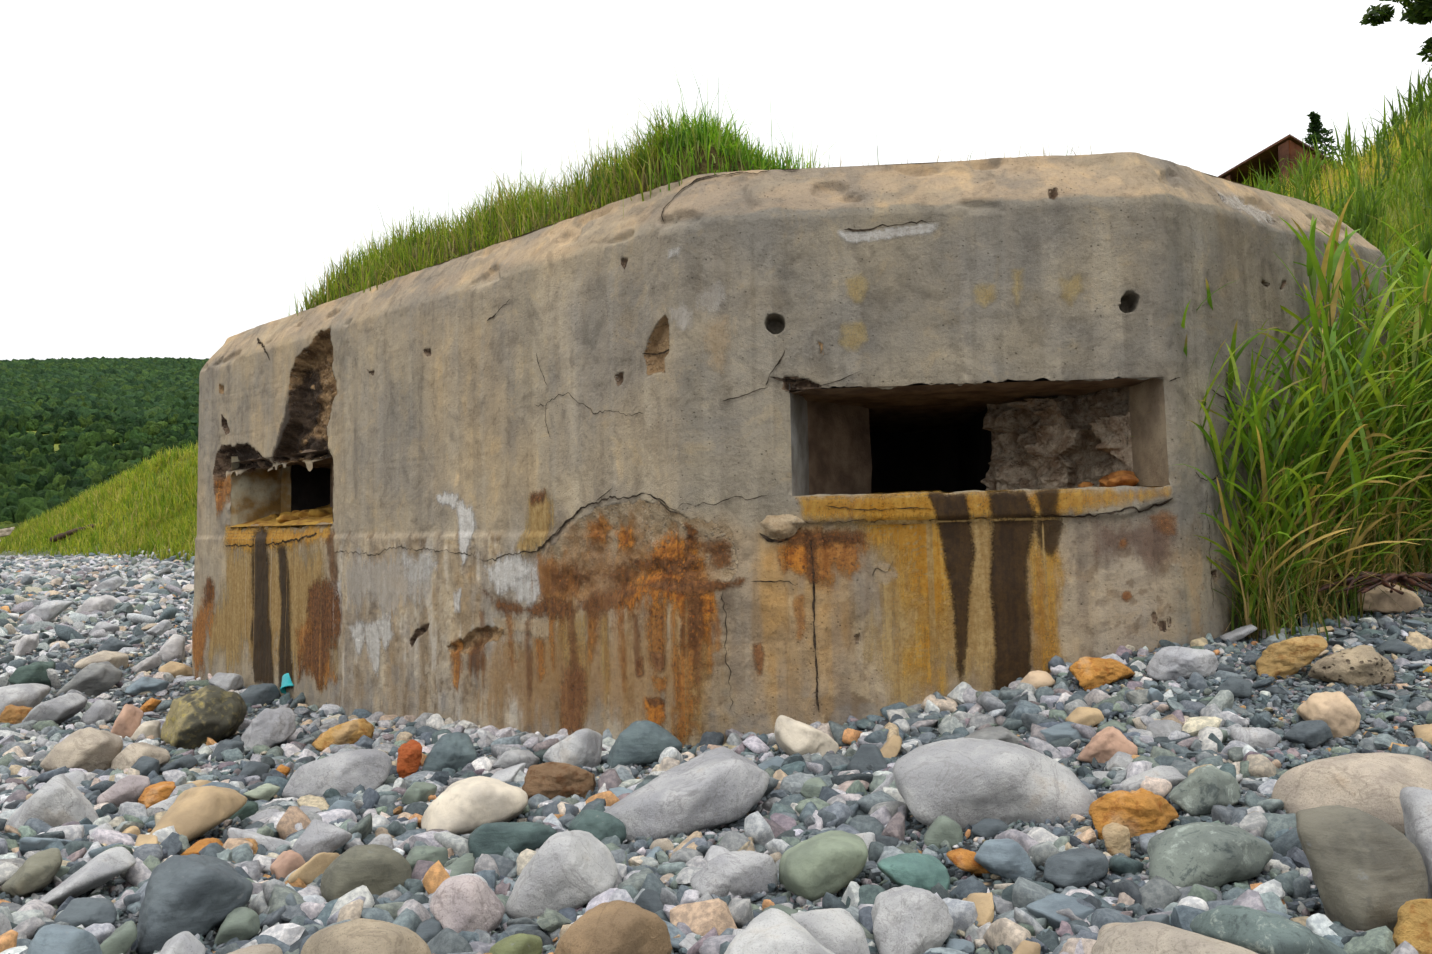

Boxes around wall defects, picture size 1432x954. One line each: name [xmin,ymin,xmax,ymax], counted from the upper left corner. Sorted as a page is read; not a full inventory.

spalling [213,328,337,496]
spalling [643,314,670,375]
crack [723,350,863,401]
rust [192,577,217,679]
rust [295,530,342,690]
crack [225,488,767,561]
rust [450,488,745,743]
rust [778,528,868,638]
rust [1096,512,1176,562]